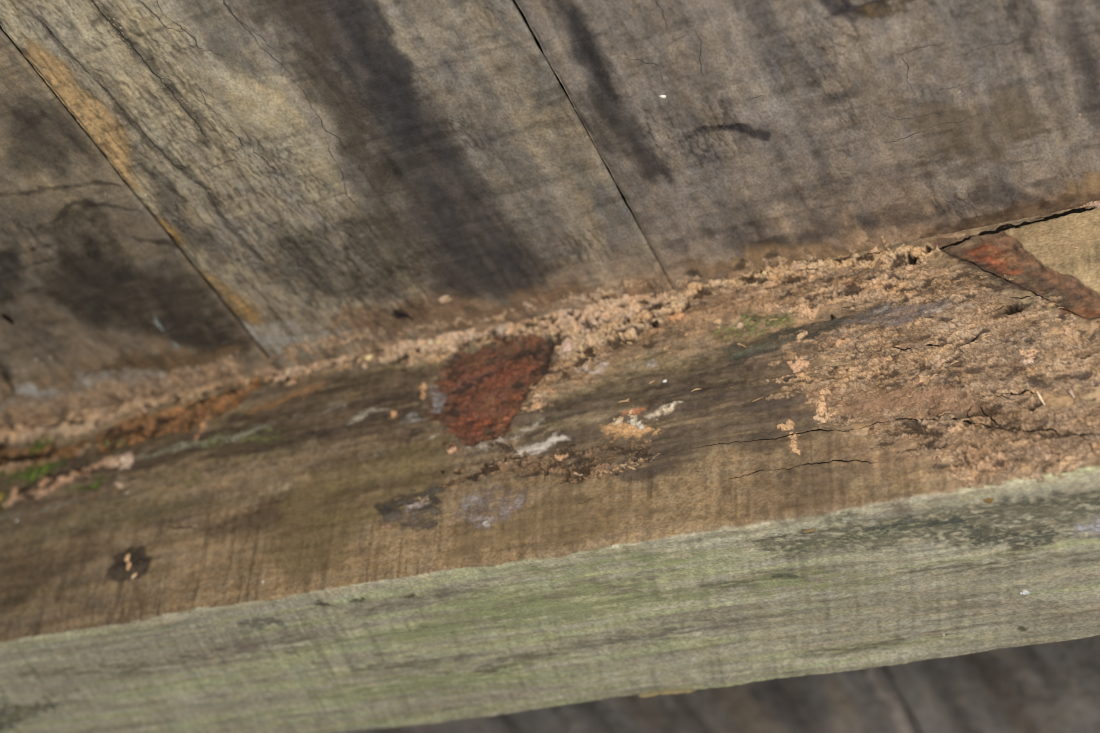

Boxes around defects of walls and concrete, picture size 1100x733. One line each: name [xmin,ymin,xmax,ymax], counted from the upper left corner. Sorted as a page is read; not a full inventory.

leakage [548,0,672,182]
leakage [0,0,610,427]
crack [730,459,876,479]
crack [678,390,1100,452]